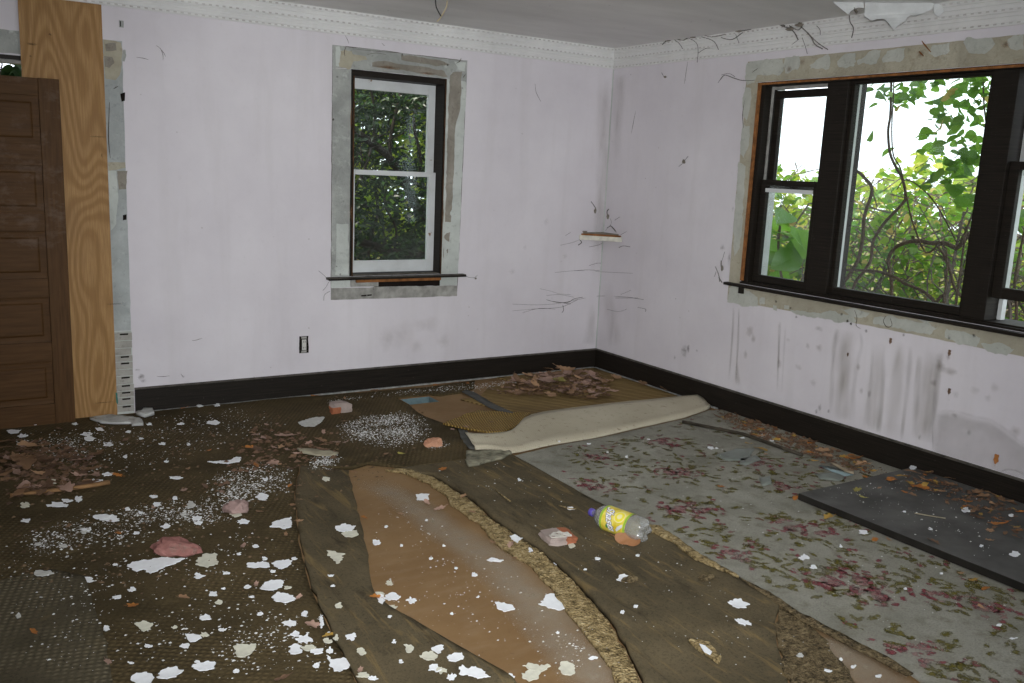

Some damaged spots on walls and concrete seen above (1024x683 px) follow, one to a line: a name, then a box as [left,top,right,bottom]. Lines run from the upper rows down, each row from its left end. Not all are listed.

peeling [833,2,944,30]